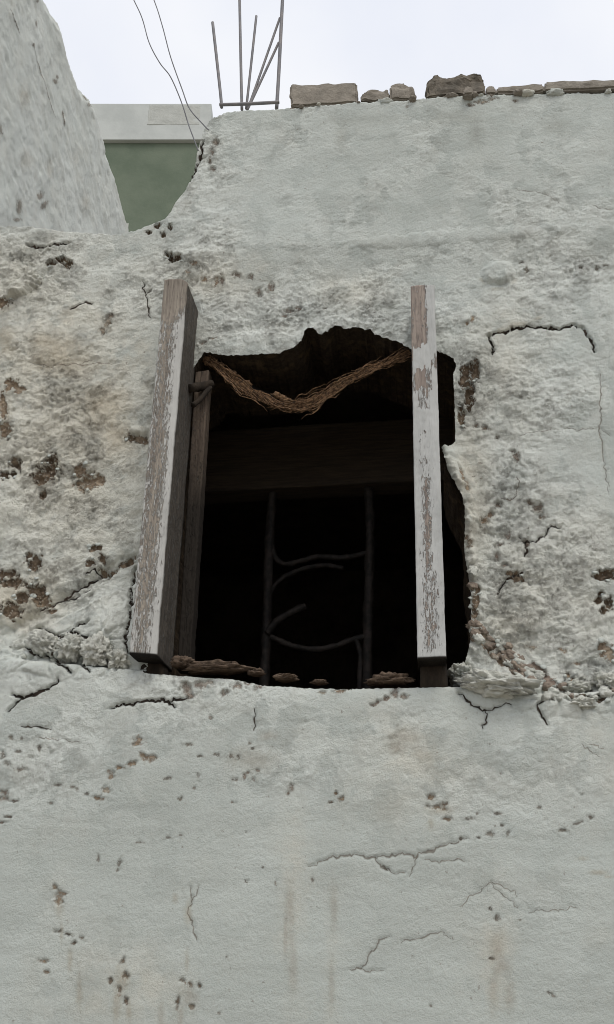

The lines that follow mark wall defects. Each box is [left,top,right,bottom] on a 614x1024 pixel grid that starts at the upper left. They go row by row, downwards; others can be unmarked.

flaking render [0,378,26,438]
flaking render [458,358,498,439]
crack [488,324,610,492]
flaking render [0,452,105,500]
flaking render [85,543,137,579]
flaking render [0,552,57,623]
flaking render [592,568,614,615]
crack [8,568,137,743]
crack [112,697,187,709]
crack [459,694,511,729]
crack [308,838,467,877]
crack [351,931,451,972]